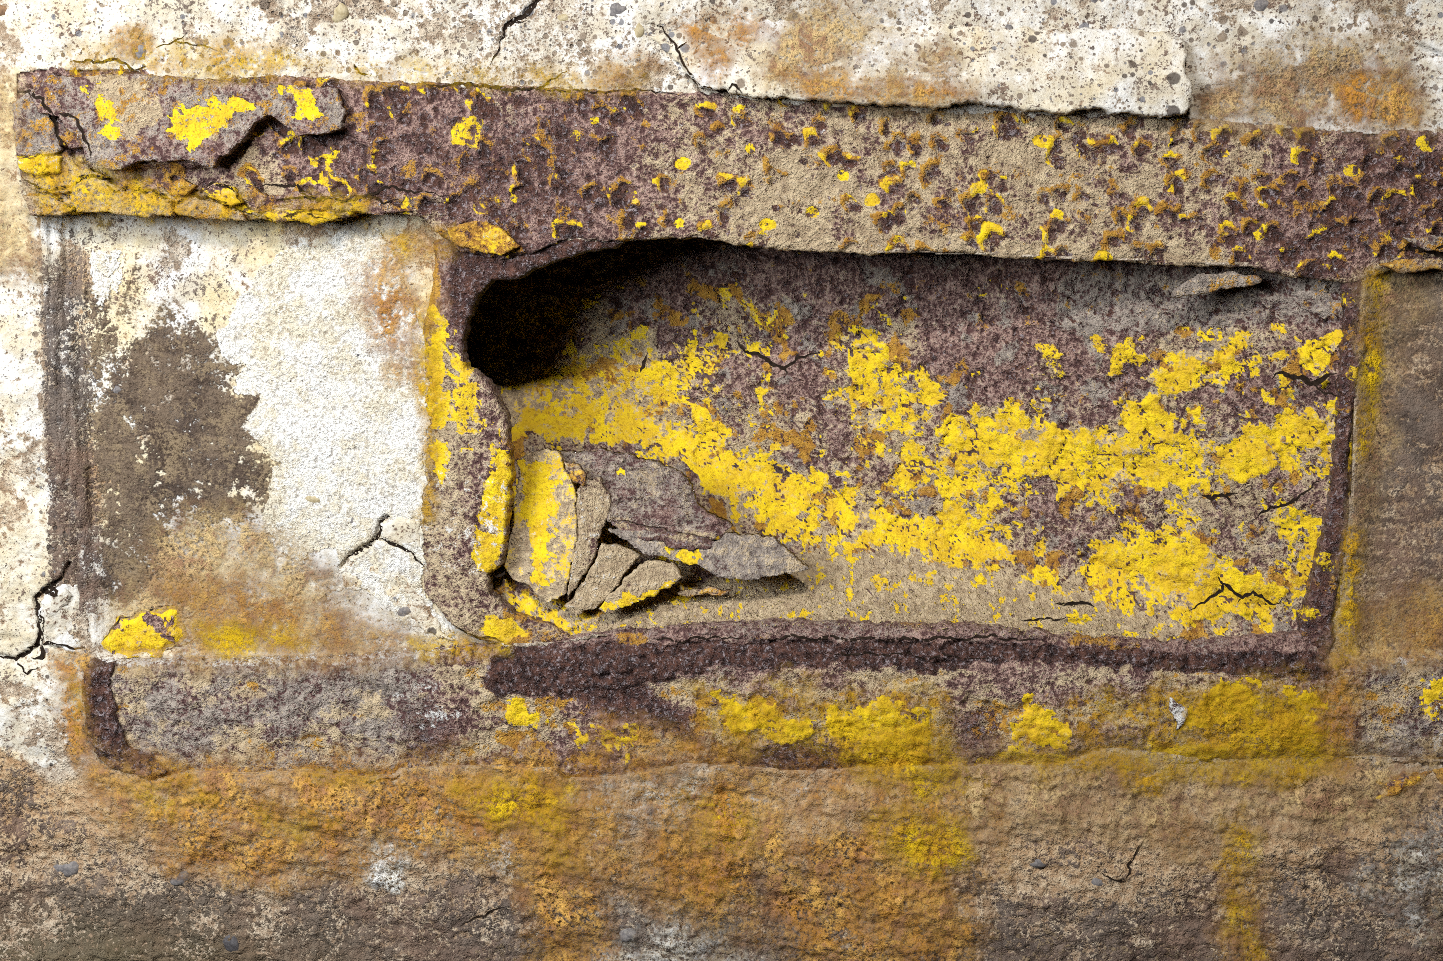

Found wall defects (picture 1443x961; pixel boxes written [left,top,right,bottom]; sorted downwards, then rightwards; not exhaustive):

crack [418,0,742,97]
crack [15,89,449,220]
leakage [79,245,281,610]
crack [0,564,202,675]